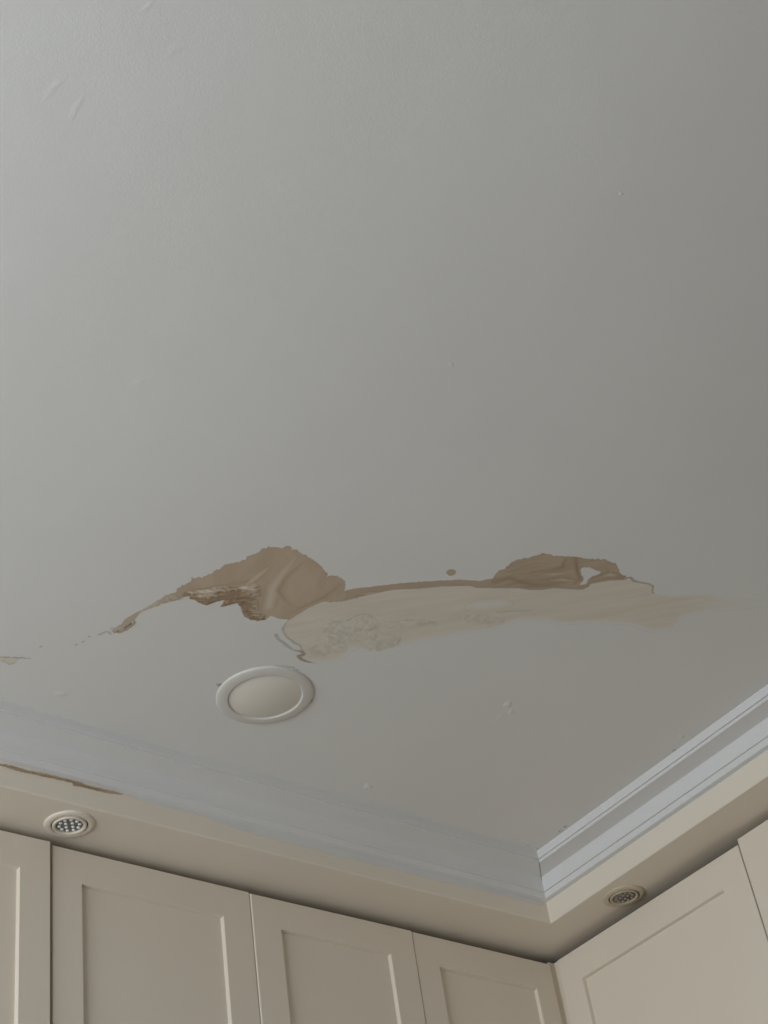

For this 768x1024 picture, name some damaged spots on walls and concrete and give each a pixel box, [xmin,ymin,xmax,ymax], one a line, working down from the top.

flaking render [111,583,266,633]